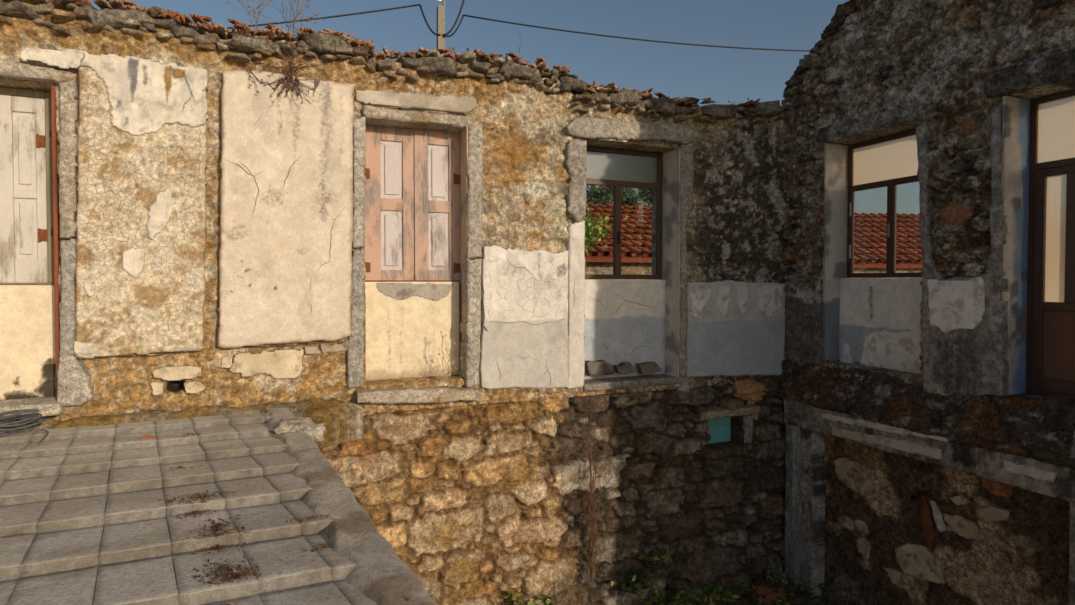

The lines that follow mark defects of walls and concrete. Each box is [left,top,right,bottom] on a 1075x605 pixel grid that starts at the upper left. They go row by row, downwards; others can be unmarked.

flaking render [20,47,207,136]
flaking render [146,188,173,239]
crack [78,52,346,359]
flaking render [122,248,145,278]
peeling [377,283,453,301]
flaking render [74,341,95,355]
peeling [884,567,915,591]